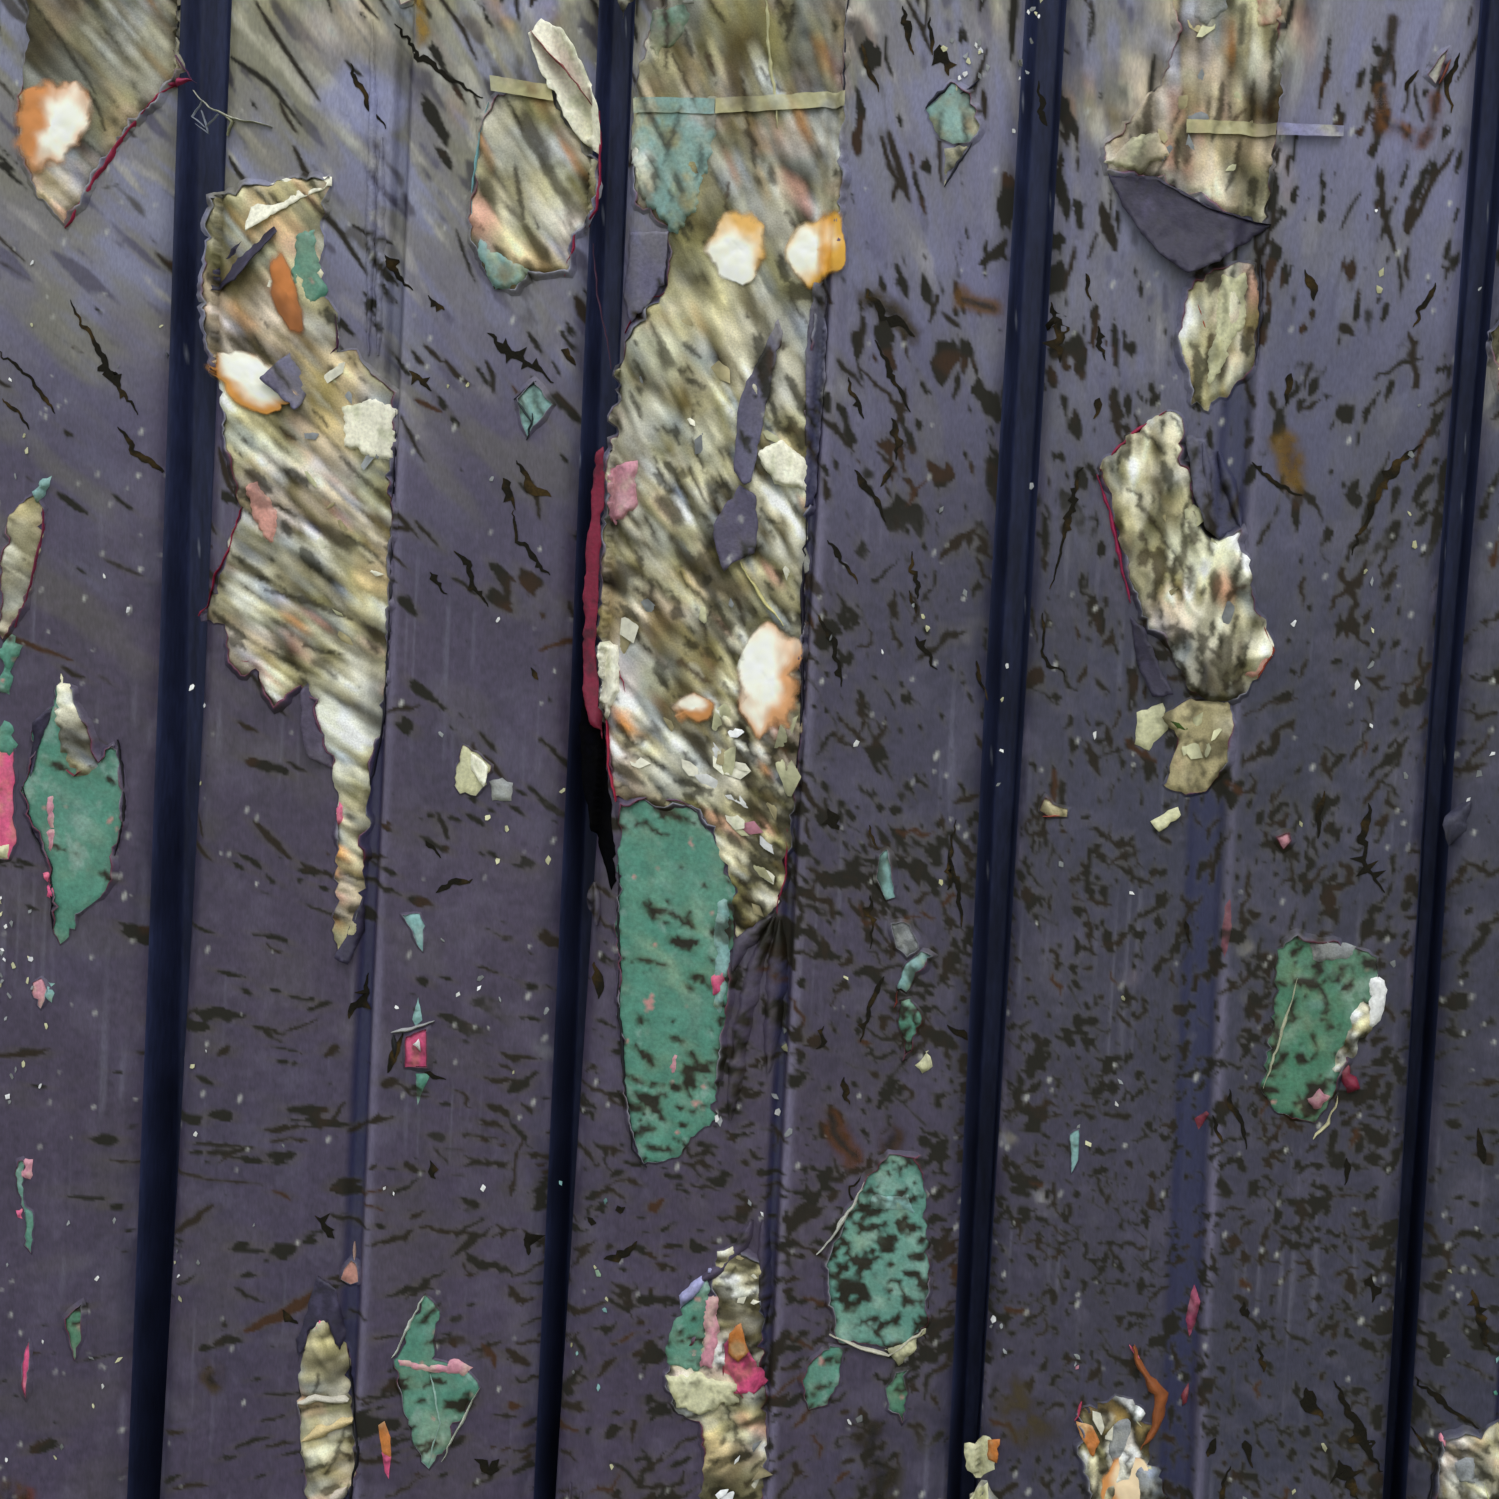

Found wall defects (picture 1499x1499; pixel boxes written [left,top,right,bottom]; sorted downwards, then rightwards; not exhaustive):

peeling [13,0,196,230]
peeling [1097,0,1286,832]
peeling [196,171,400,965]
peeling [465,0,854,1168]
peeling [0,674,129,946]
peeling [1258,928,1396,1140]
peeling [295,1241,362,1499]
peeling [392,1293,481,1470]
peeling [661,1243,772,1499]
peeling [797,1149,934,1426]
peeling [1072,1344,1189,1499]
peeling [1427,1419,1499,1499]